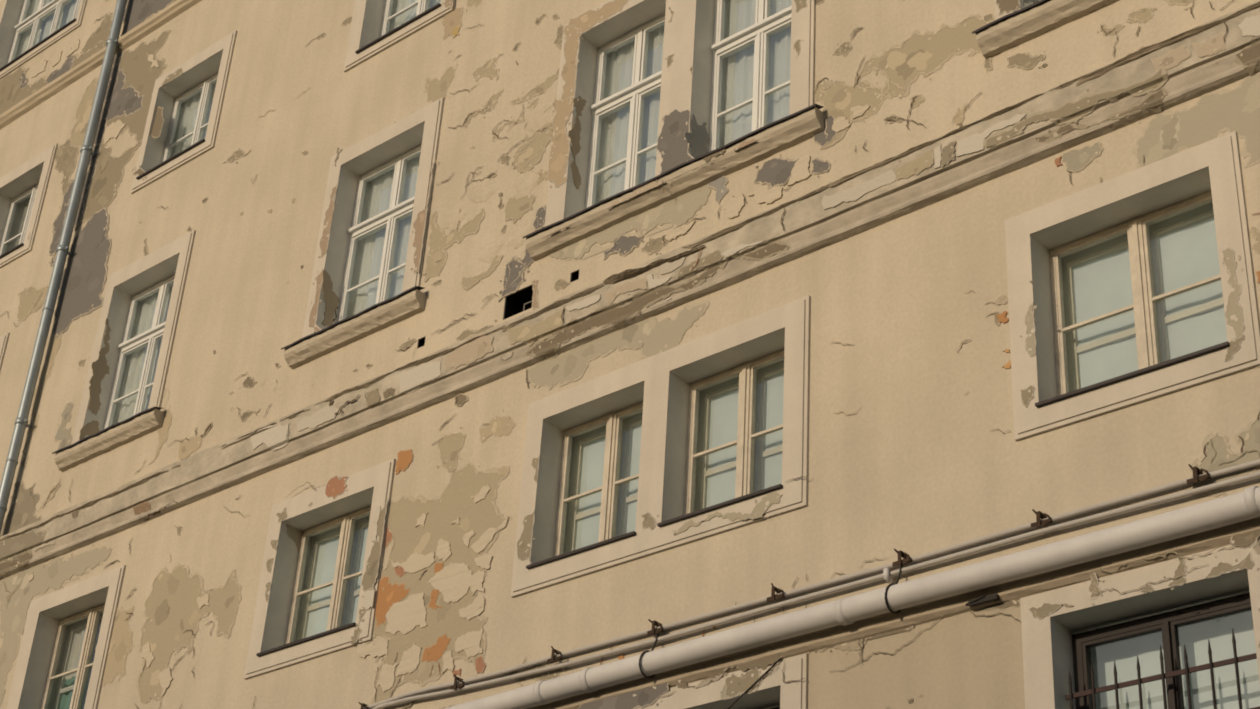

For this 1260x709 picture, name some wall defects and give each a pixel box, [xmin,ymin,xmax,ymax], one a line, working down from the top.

flaking render [0,0,183,440]
peeling [221,0,1260,450]
peeling [1187,407,1260,497]
peeling [137,564,242,704]
peeling [351,427,535,704]
peeling [1029,602,1074,620]
peeling [1141,556,1187,593]
peeling [1205,529,1260,579]